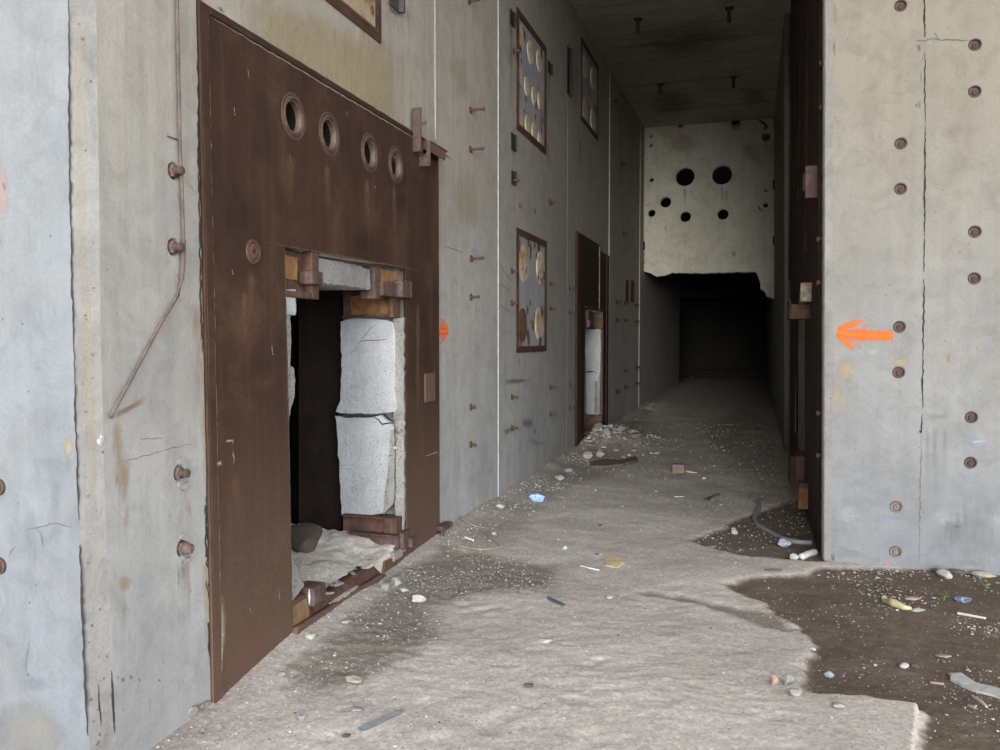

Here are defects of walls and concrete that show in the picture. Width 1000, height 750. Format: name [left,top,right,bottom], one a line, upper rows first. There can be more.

rust [268,15,384,111]
crack [918,0,972,560]
crack [117,437,190,464]